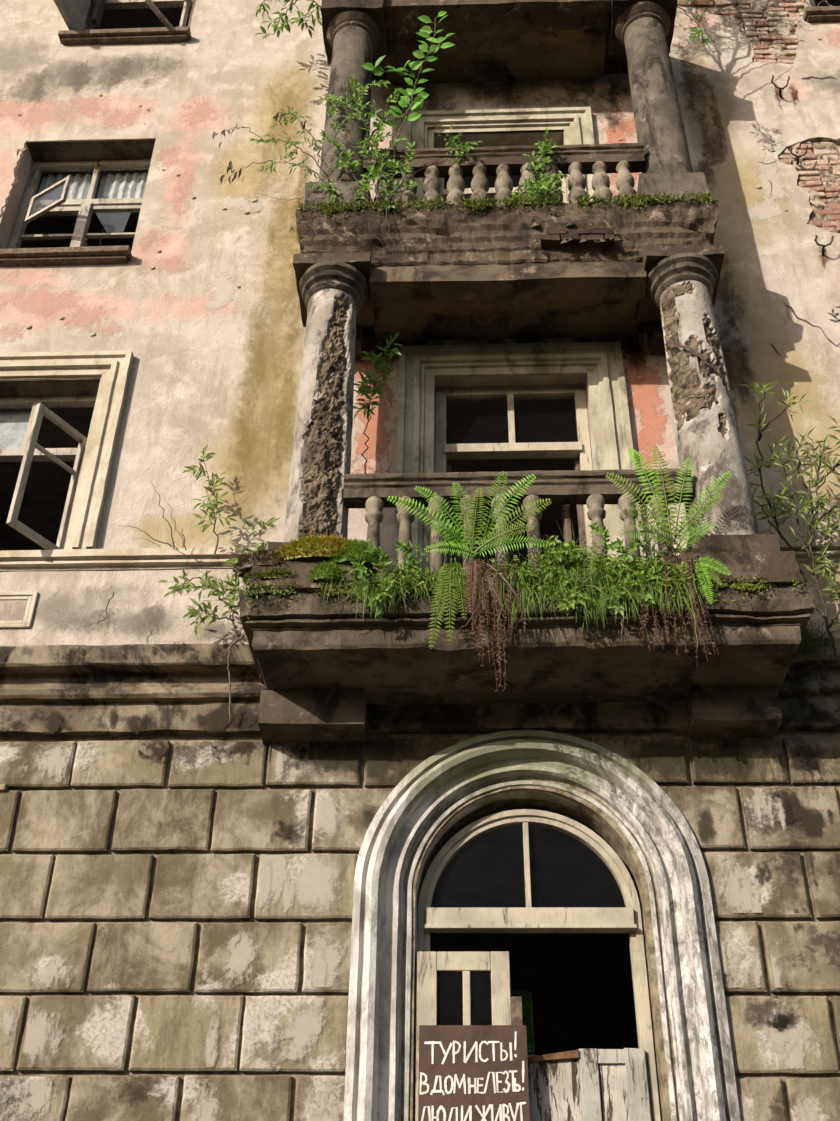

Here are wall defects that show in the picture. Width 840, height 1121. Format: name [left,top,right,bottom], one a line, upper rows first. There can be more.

spalling [677,0,804,64]
spalling [745,137,840,233]
crack [782,299,840,347]
spalling [624,283,727,469]
spalling [302,298,394,538]
leakage [315,800,340,836]
leakage [746,788,832,839]
leakage [258,855,339,913]
leakage [716,854,771,913]
leakage [270,929,346,1060]
leakage [718,935,821,1069]
leakage [2,1006,65,1063]